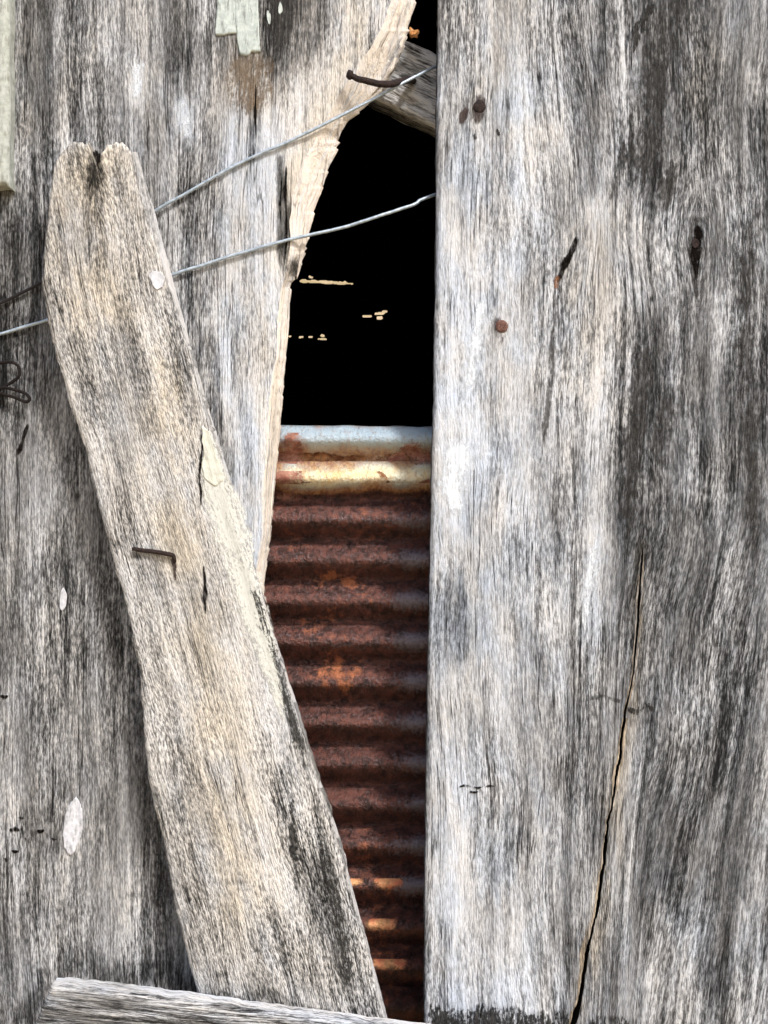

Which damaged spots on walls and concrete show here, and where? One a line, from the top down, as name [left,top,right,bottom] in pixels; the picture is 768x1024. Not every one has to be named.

corrosion [472,95,485,122]
corrosion [275,433,431,501]
crack [569,543,656,1024]
corrosion [374,878,403,889]
corrosion [369,918,396,931]
corrosion [374,953,407,970]